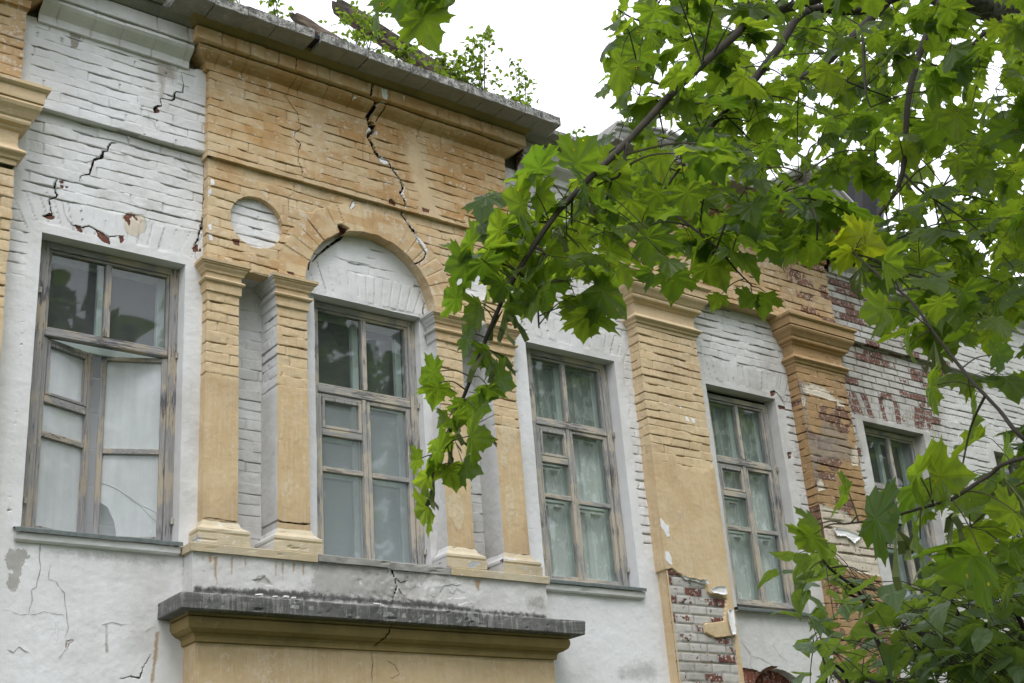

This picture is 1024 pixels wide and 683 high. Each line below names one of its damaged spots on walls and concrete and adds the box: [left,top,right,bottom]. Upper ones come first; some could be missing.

crack [140,79,188,129]
crack [43,142,147,237]
crack [362,86,427,265]
flaking render [96,212,146,244]
crack [313,237,368,288]
peeling [799,383,845,407]
peeling [850,445,859,466]
flaking render [5,548,30,591]
crack [8,544,69,659]
crack [371,570,418,682]
flaking render [665,551,774,683]
peeling [819,504,881,577]